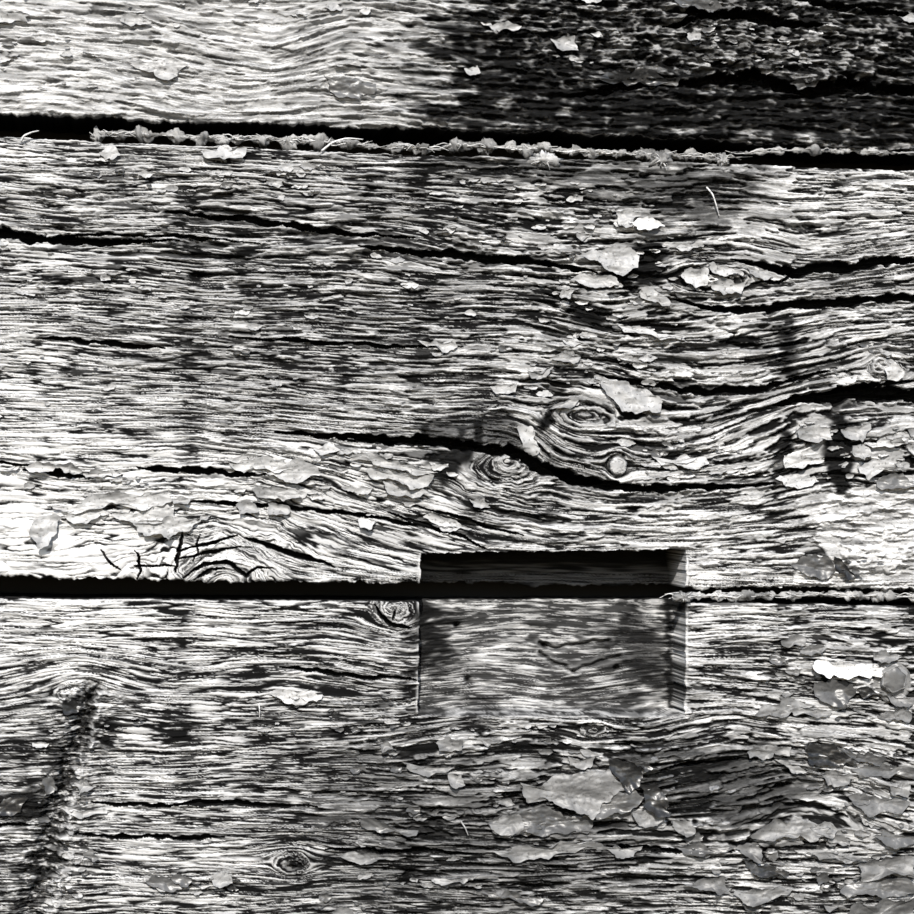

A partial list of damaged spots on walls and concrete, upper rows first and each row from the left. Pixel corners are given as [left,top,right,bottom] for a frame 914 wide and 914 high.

crack [0,210,598,274]
peeling [524,193,773,340]
peeling [490,327,663,414]
peeling [0,461,211,550]
crack [0,460,268,480]
crack [100,532,335,580]
peeling [226,442,458,515]
crack [179,500,524,549]
crack [274,430,774,495]
peeling [776,414,914,490]
crack [0,821,39,829]
peeling [473,724,914,914]